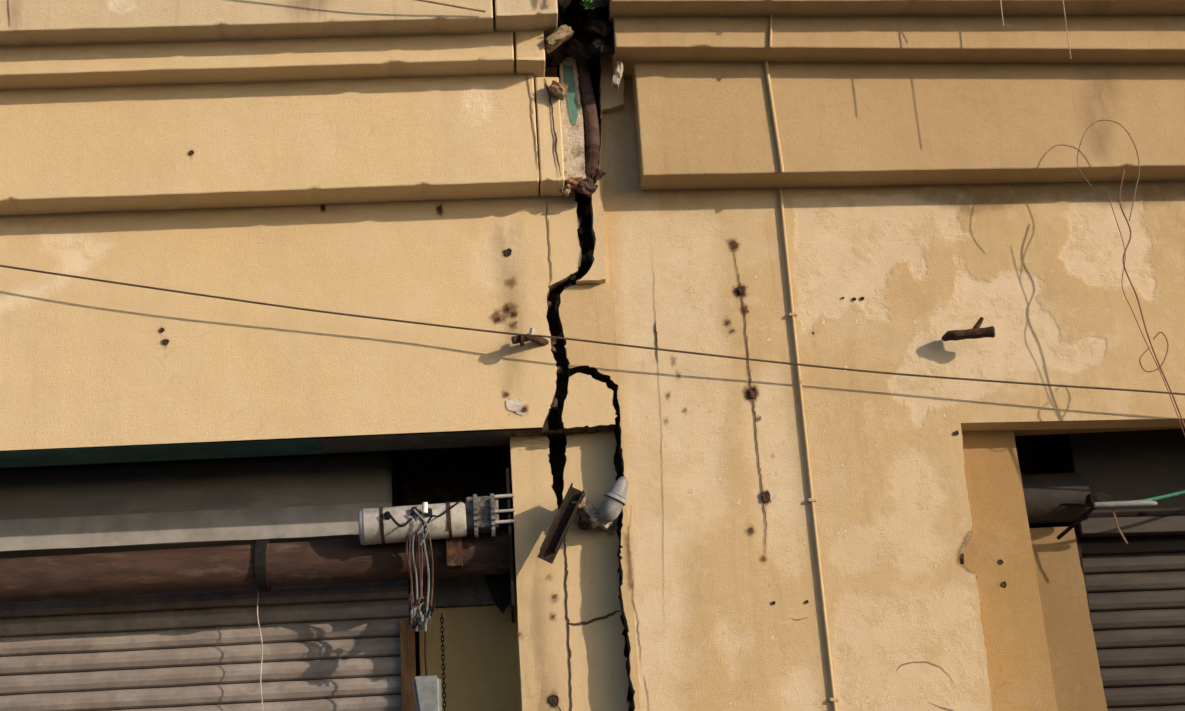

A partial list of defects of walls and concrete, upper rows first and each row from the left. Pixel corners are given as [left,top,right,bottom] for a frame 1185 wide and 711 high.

peeling [537,0,615,125]
rust [493,303,517,326]
crack [527,76,622,510]
crack [564,234,665,711]
rust [727,240,775,560]
peeling [606,181,1174,711]